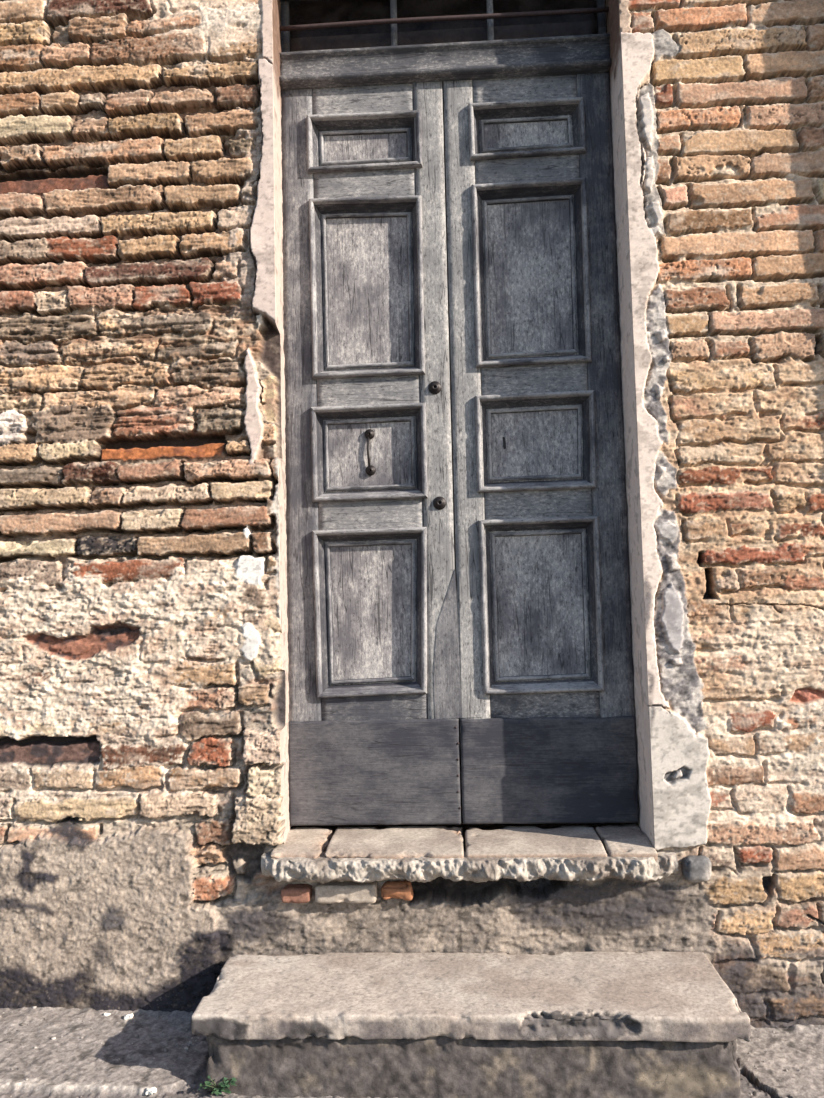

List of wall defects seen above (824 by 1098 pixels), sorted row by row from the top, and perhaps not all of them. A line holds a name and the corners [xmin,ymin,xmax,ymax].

peeling [636,83,665,242]
flaking render [255,310,282,458]
peeling [642,284,708,736]
spalling [21,621,141,662]
spalling [789,687,824,705]
spalling [0,735,102,768]
peeling [663,766,691,785]
spalling [520,1008,642,1041]